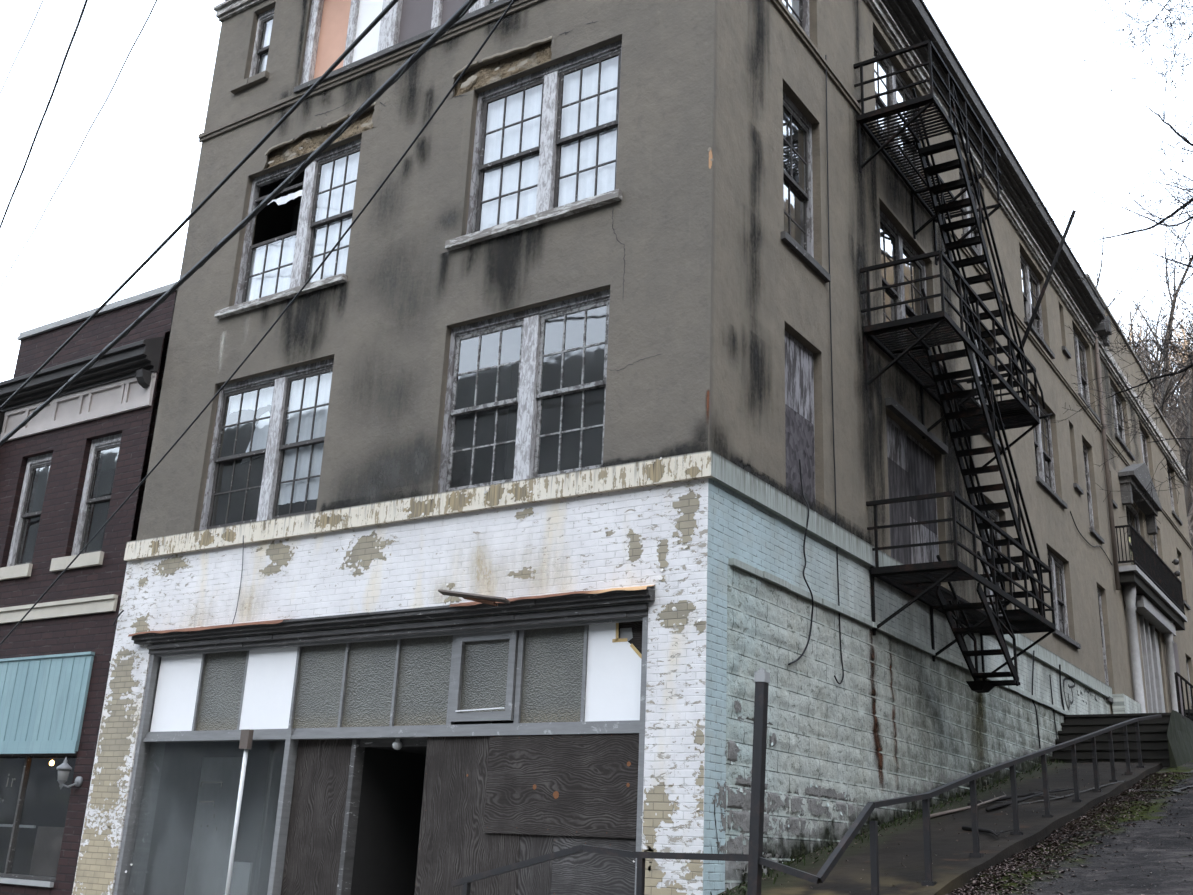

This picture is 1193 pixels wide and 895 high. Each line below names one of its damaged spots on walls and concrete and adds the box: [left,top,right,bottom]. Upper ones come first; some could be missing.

peeling [646,457,671,483]
peeling [309,513,348,529]
peeling [403,481,539,522]
peeling [605,466,702,585]